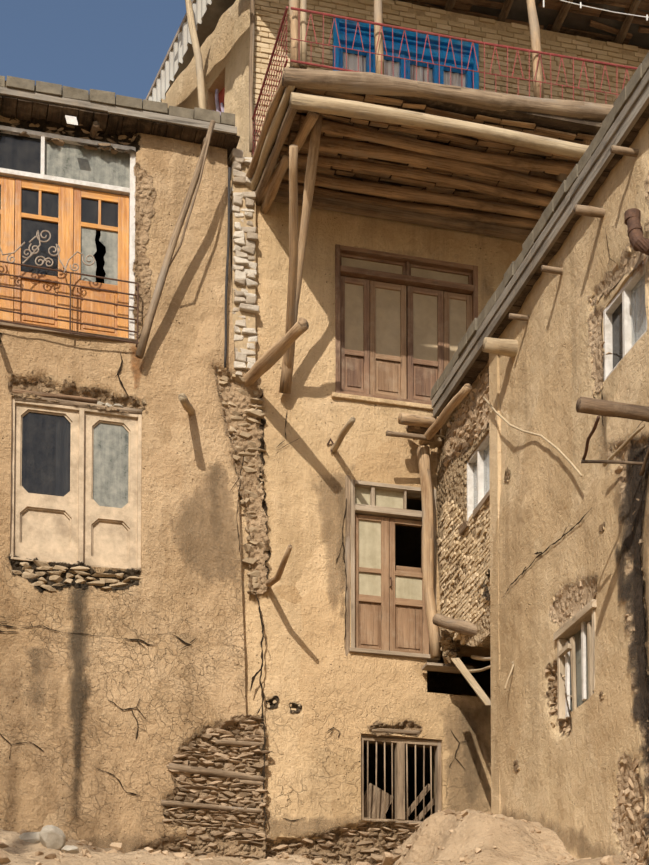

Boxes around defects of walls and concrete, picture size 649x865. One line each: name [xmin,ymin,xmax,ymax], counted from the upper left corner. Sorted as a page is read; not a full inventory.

flaking render [587,243,649,396]
leakage [69,589,90,791]
crack [108,699,146,738]
crack [124,635,197,650]
crack [231,388,305,832]
spalling [265,696,302,713]
crack [501,509,591,598]
spalling [544,659,572,736]
leakage [615,440,649,764]
crack [97,765,143,797]
spalling [161,714,272,846]
flaking render [611,753,649,865]